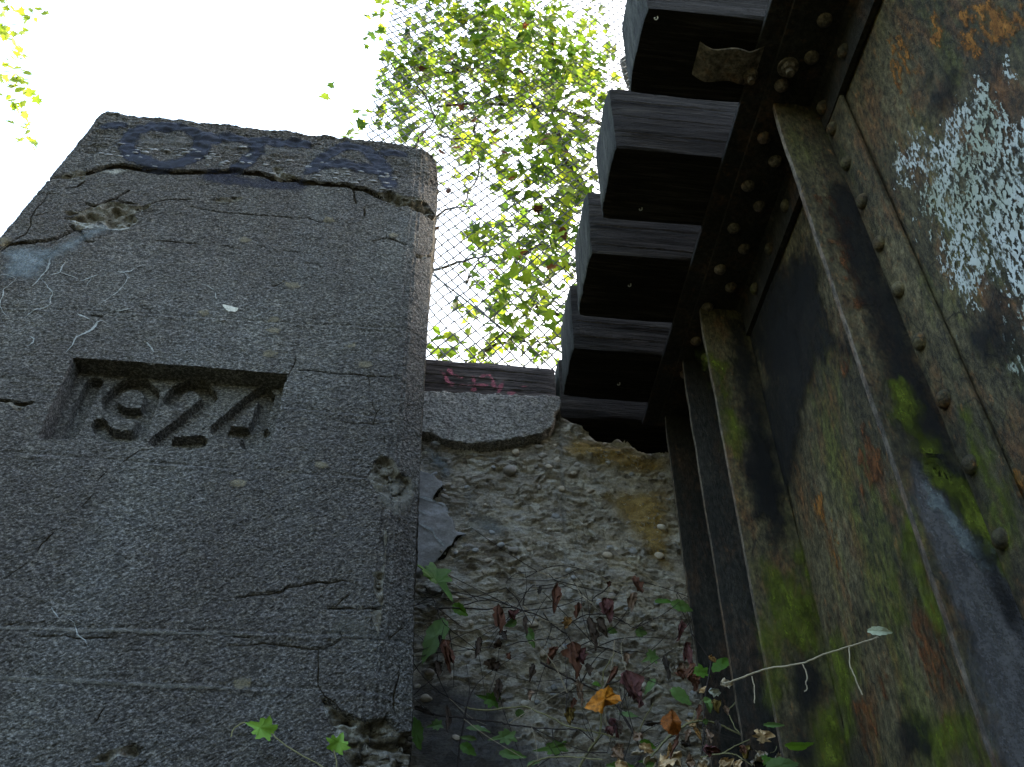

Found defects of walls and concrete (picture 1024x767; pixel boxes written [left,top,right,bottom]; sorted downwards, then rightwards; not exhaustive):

rust [958,0,1024,59]
spalling [65,202,151,230]
crack [4,165,383,254]
spalling [61,143,432,216]
peeling [893,74,1024,376]
water stain [0,237,98,318]
water stain [726,241,850,539]
water stain [830,183,1024,767]
spalling [368,411,710,767]
crack [183,580,404,712]
water stain [793,658,819,712]
spalling [323,704,429,767]